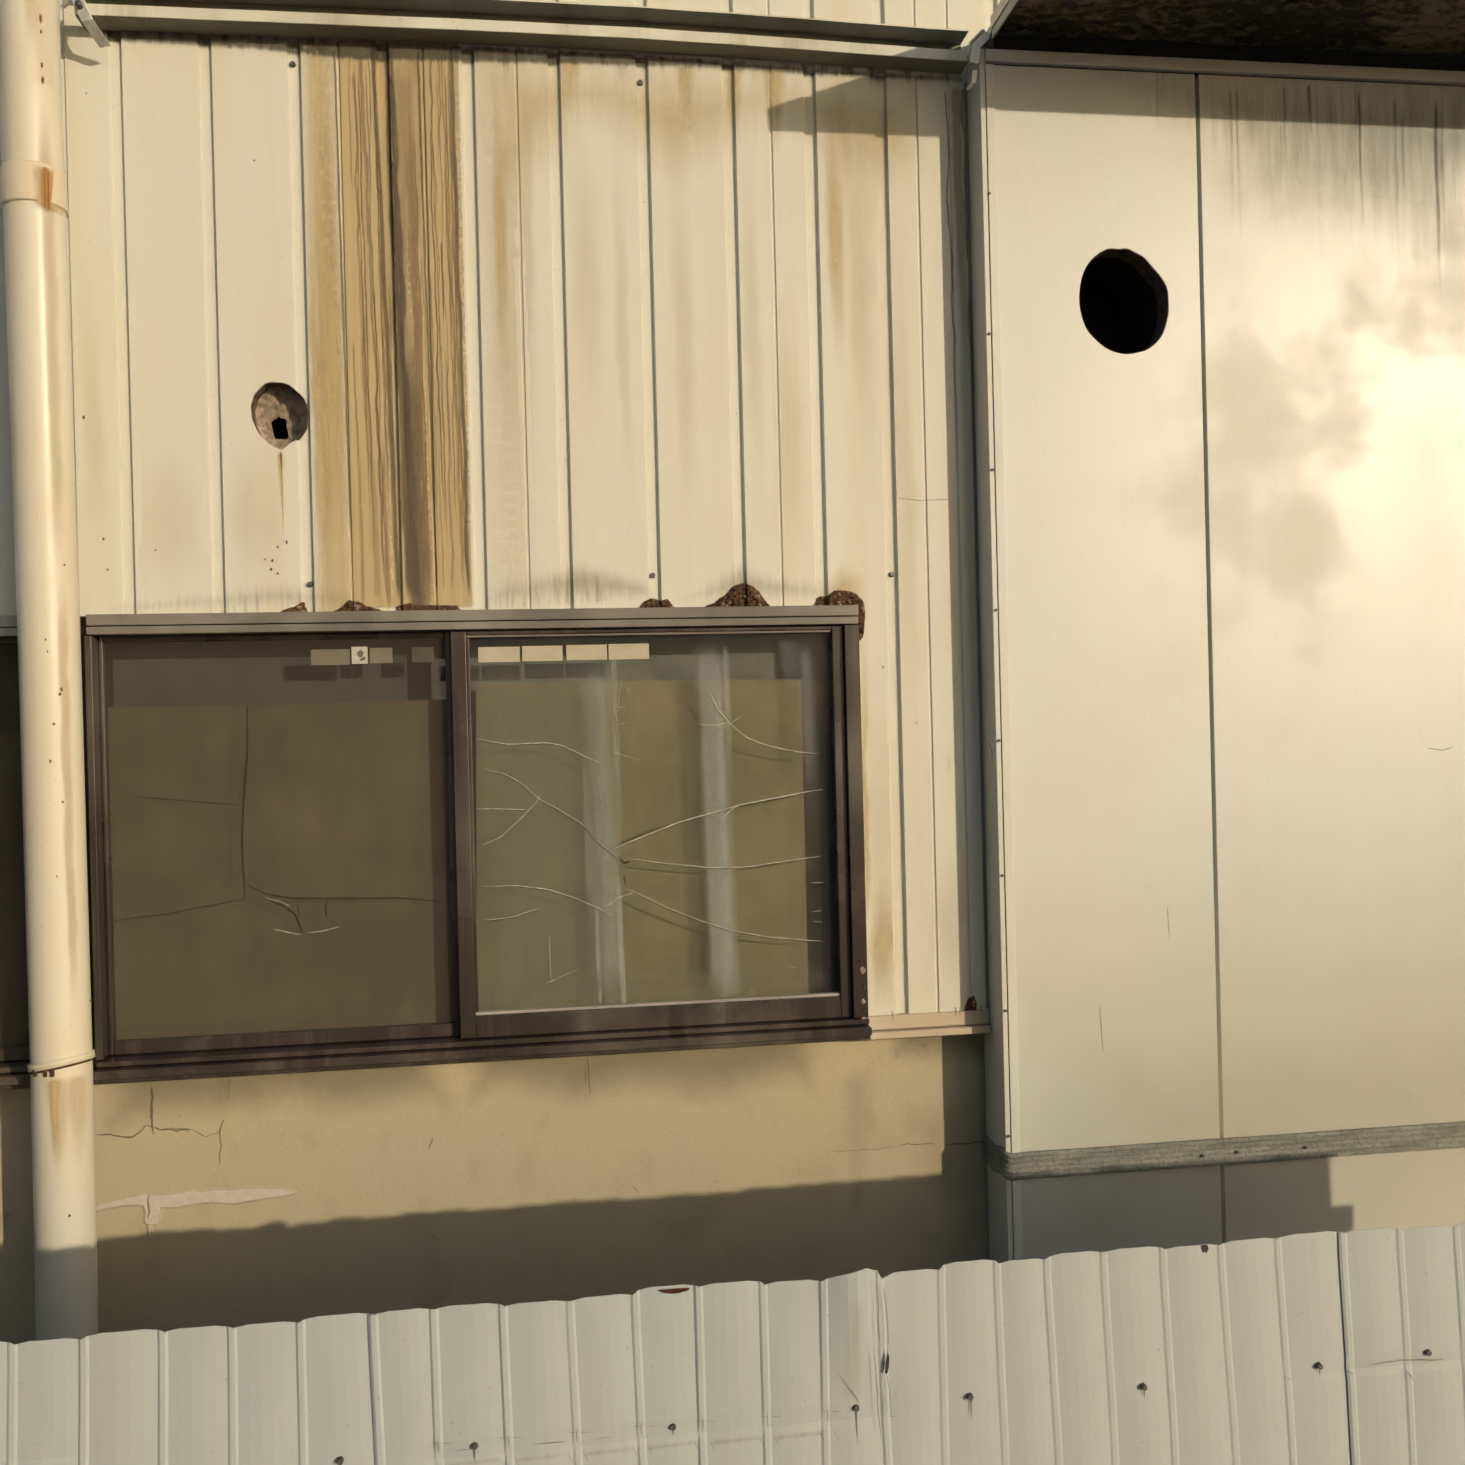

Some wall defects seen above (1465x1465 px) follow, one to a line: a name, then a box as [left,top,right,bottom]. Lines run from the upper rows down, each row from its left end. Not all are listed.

leakage [104,30,925,610]
rust [640,598,674,608]
rust [705,583,770,607]
rust [815,590,865,640]
peeling [96,1186,298,1240]